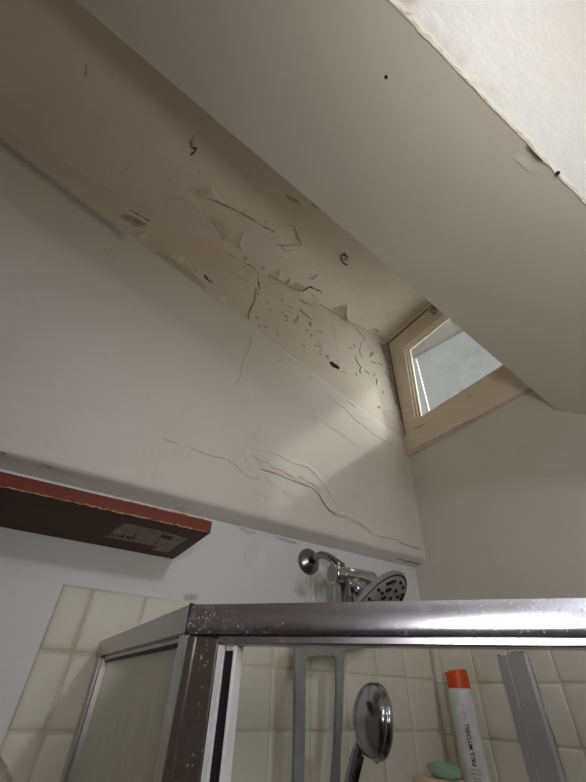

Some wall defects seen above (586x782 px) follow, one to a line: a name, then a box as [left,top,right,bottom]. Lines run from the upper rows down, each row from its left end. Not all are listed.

crack [226,252,388,383]
crack [163,438,422,565]